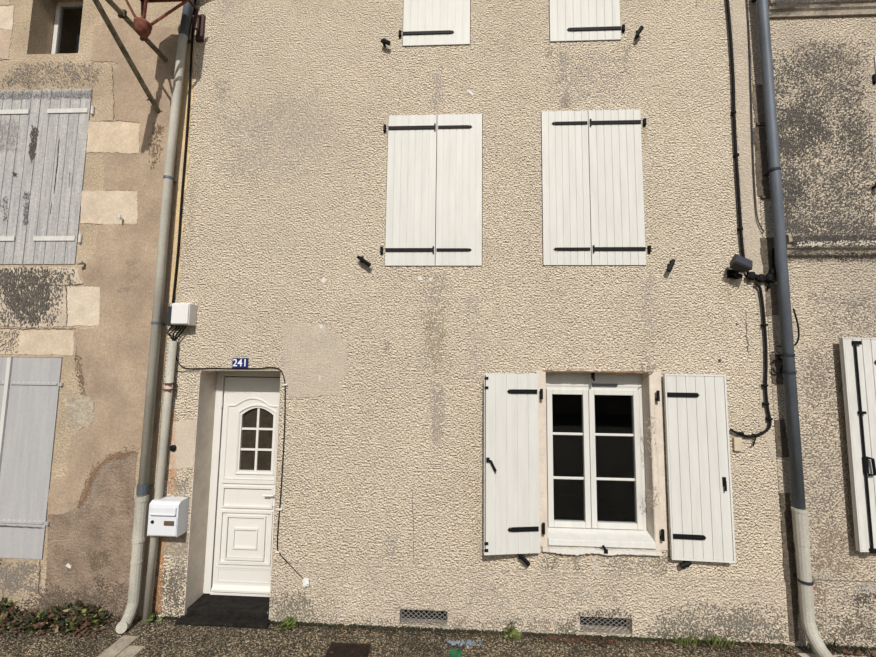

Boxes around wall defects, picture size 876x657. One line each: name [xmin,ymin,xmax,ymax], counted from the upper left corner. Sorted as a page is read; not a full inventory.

water stain [773,32,876,260]
water stain [0,267,77,353]